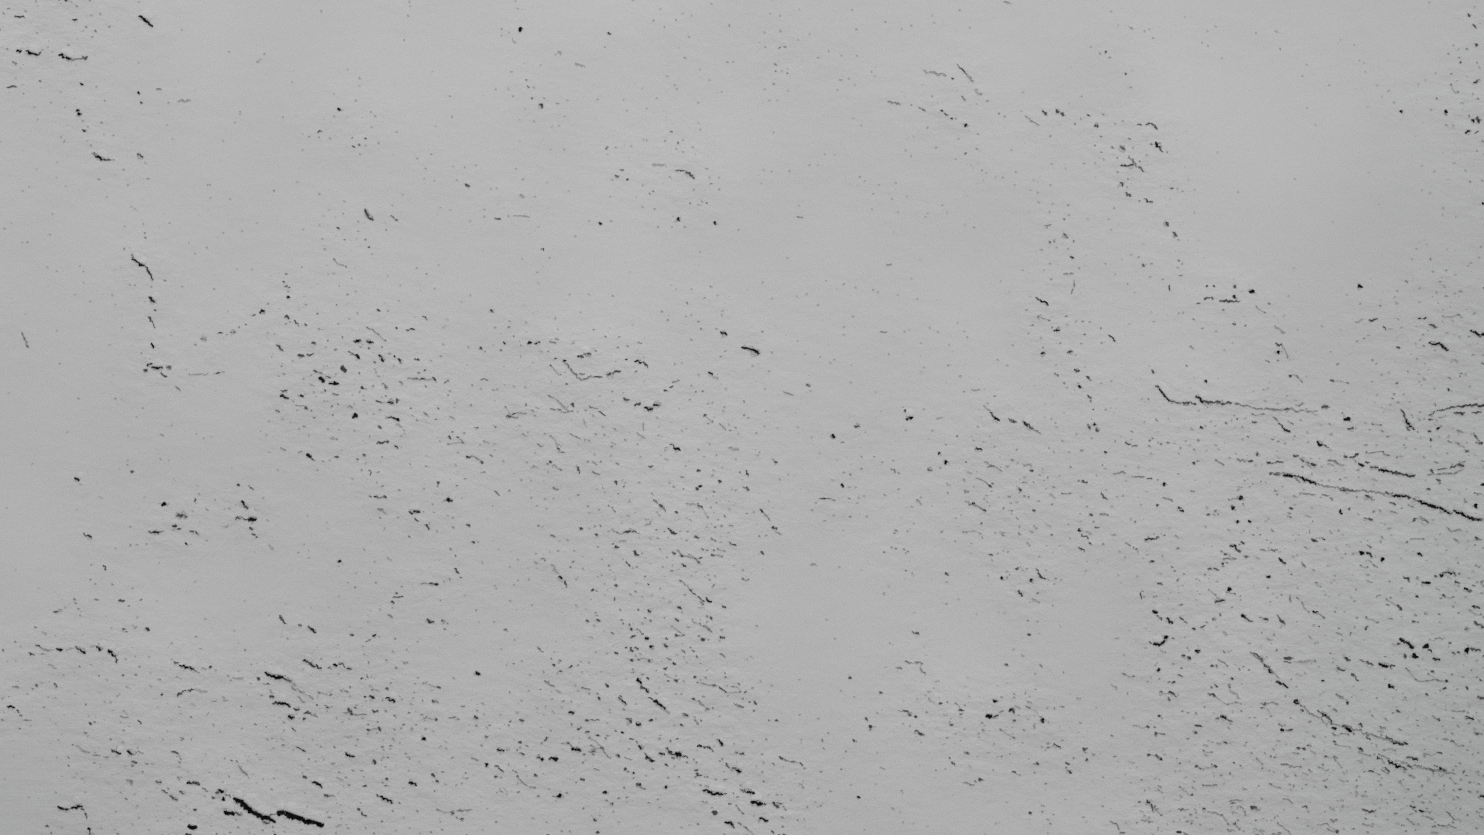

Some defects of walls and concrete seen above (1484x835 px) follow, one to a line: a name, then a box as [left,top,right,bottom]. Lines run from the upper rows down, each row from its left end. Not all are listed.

crack [6,0,88,94]
crack [1369,317,1484,351]
crack [1155,381,1484,775]
crack [1149,603,1175,647]
crack [76,745,336,835]